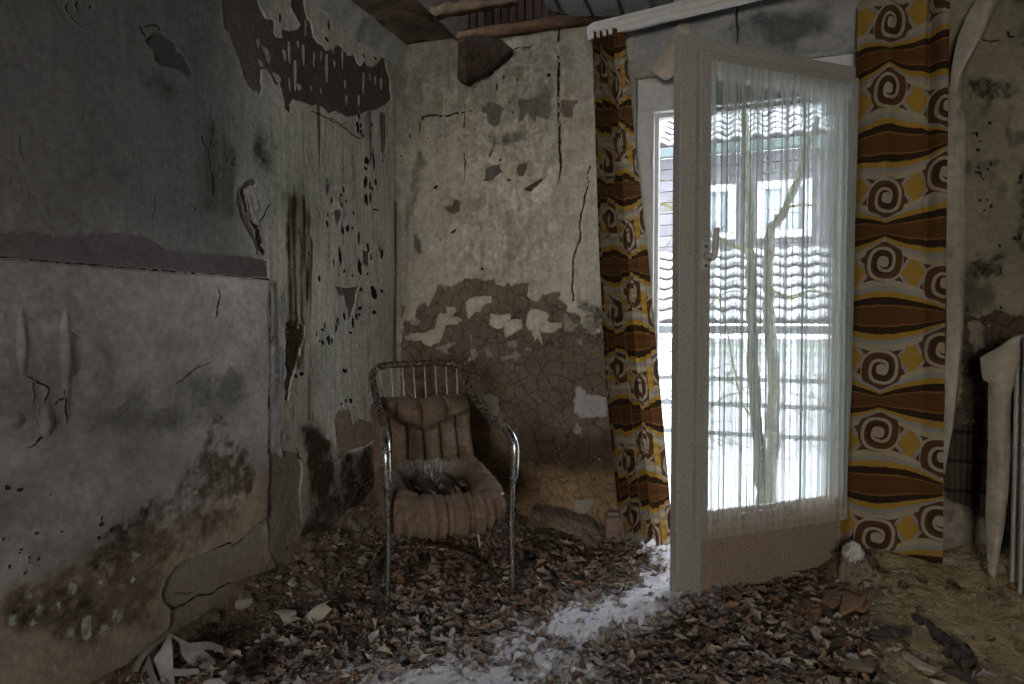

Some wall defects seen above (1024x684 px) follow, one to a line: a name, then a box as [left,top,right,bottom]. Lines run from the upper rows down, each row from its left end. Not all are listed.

peeling [0,179,267,277]
peeling [222,0,391,565]
crack [418,95,473,187]
peeling [483,146,560,204]
peeling [481,72,578,126]
crack [513,28,593,302]
crack [25,374,70,449]
peeling [400,267,618,527]
leakage [3,417,252,653]
leakage [300,426,375,537]